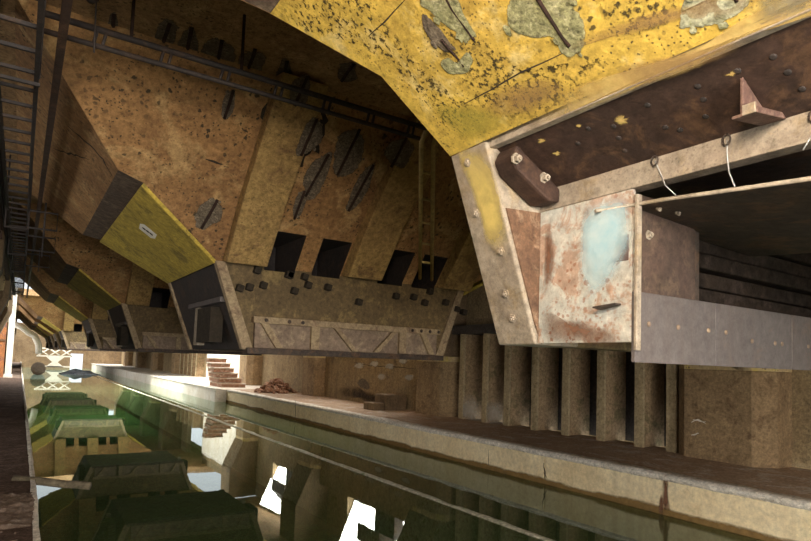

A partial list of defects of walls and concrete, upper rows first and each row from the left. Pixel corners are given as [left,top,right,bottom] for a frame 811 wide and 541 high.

spalling [420,0,476,74]
spalling [503,0,586,57]
spalling [679,0,750,34]
corrosion [545,232,553,280]
corrosion [552,319,610,341]
corrosion [659,480,669,512]